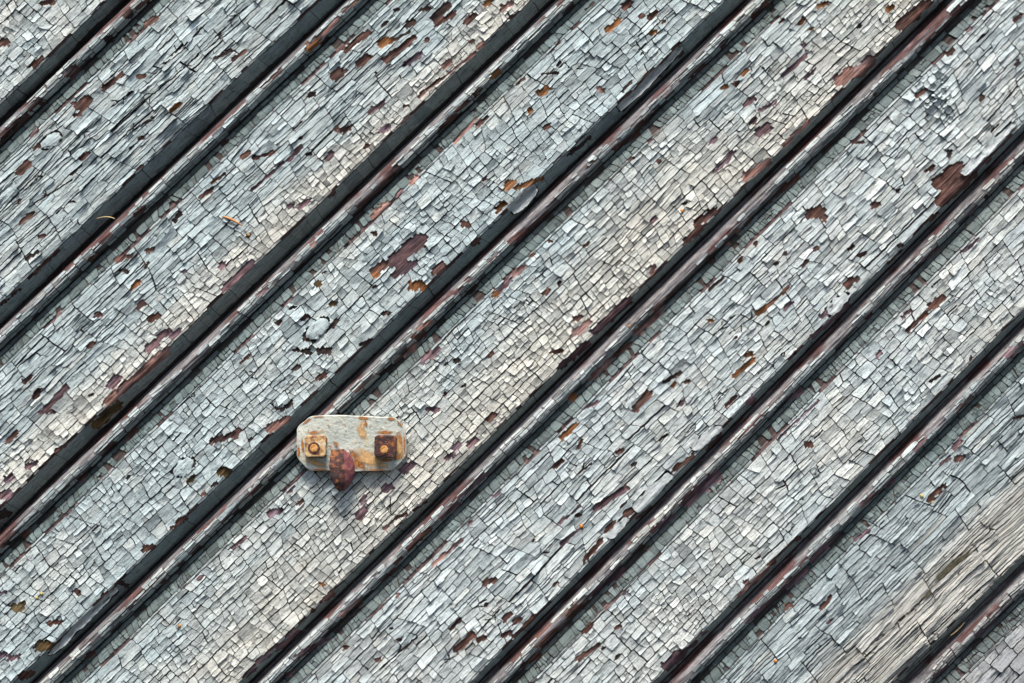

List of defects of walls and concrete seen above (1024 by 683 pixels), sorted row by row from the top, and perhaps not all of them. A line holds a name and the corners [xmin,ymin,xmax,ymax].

peeling [778,0,881,90]
peeling [70,62,147,119]
crack [23,5,250,215]
peeling [917,122,1017,223]
peeling [364,171,449,293]
peeling [21,238,183,430]
crack [711,309,755,339]
peeling [186,422,254,498]
rust [297,416,405,471]
crack [379,633,419,670]
crack [469,596,502,633]
crack [853,588,981,673]